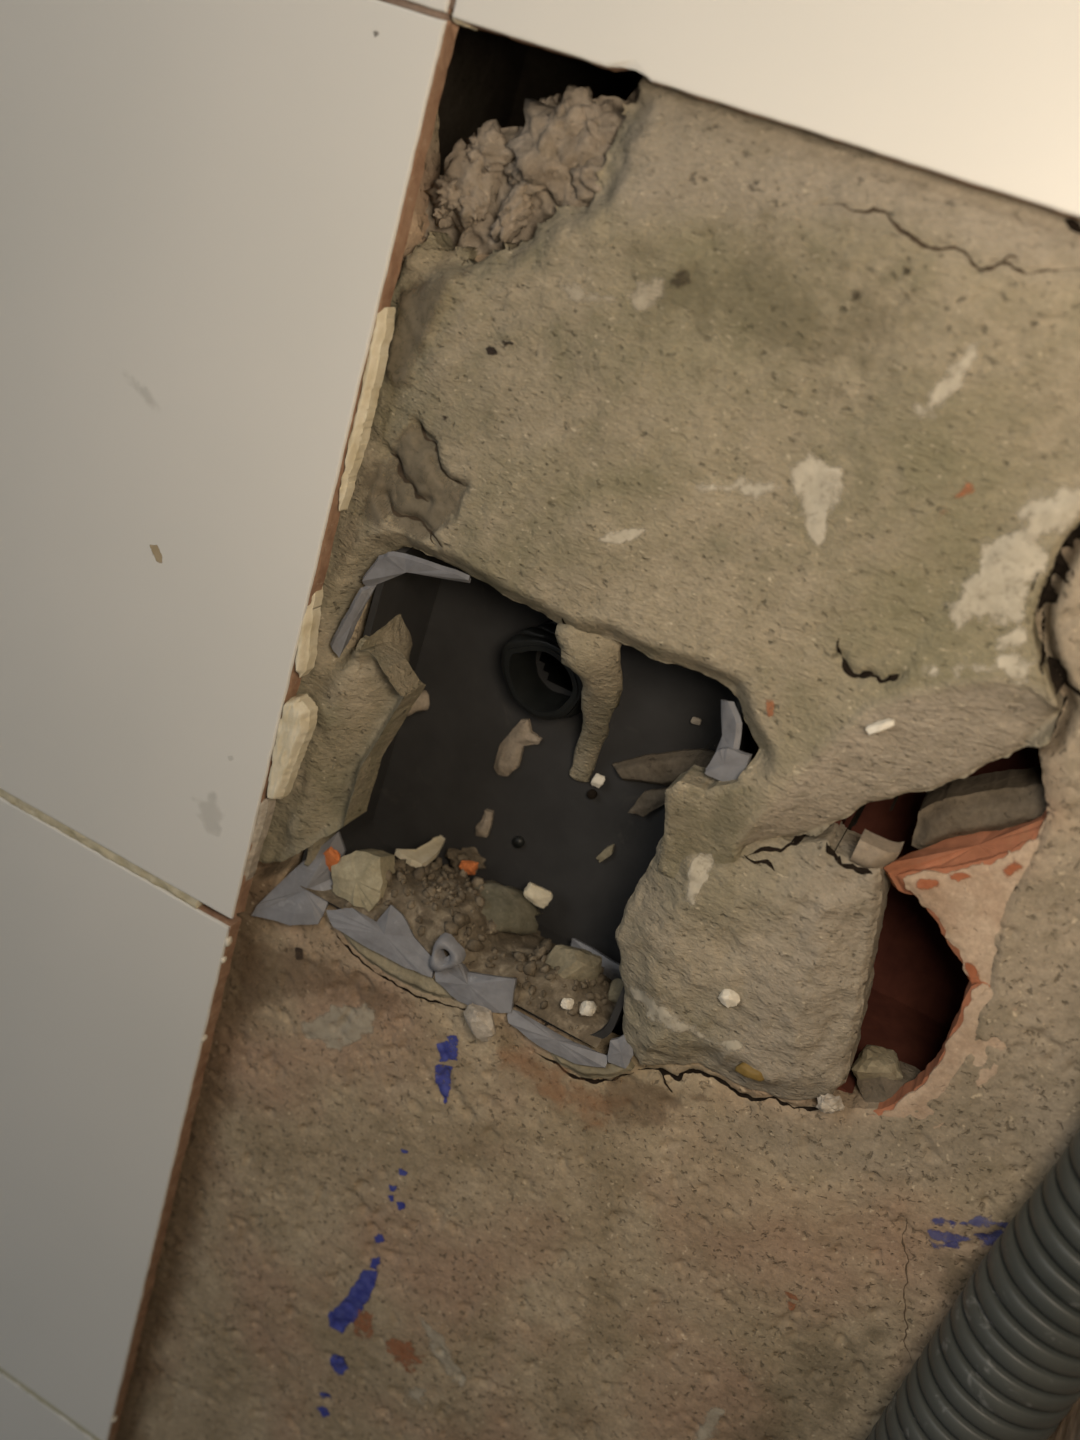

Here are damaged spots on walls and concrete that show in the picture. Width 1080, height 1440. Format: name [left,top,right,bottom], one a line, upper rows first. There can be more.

crack [821,204,1080,275]
crack [836,638,900,683]
peeling [865,718,895,735]
peeling [591,773,605,788]
spalling [323,846,341,871]
spalling [459,860,479,875]
peeling [524,882,553,908]
peeling [718,989,740,1008]
crack [535,1052,818,1111]